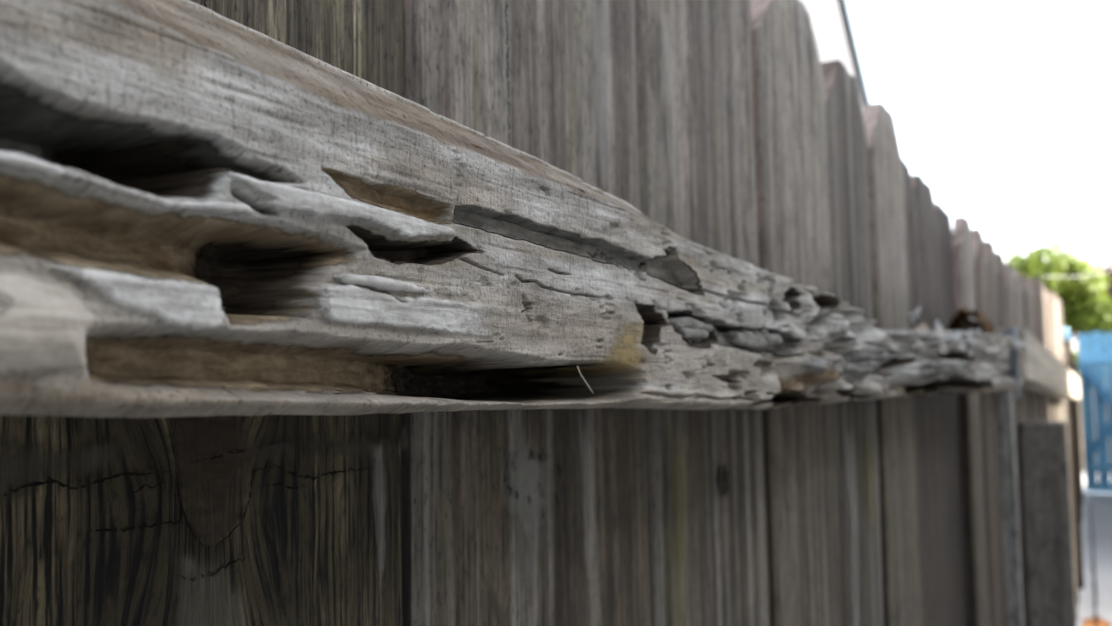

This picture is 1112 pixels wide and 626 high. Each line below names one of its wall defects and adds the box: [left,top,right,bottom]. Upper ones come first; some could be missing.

spalling [0,83,706,400]
spalling [782,284,841,314]
spalling [633,302,800,355]
spalling [870,351,916,378]
spalling [903,306,1034,398]
spalling [722,388,823,411]
spalling [835,387,868,402]
crack [3,471,170,496]
crack [253,464,374,489]
crack [175,557,246,581]